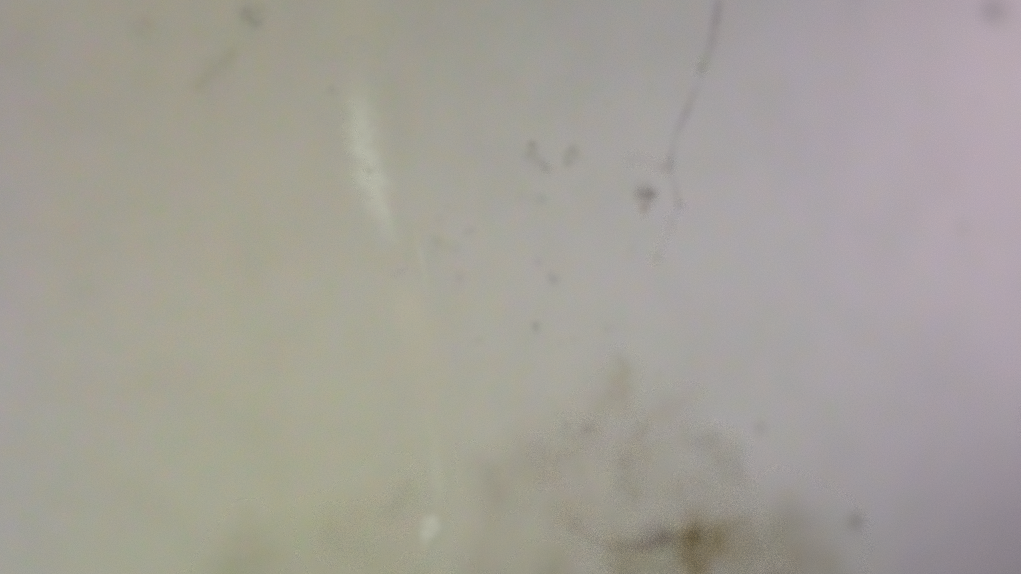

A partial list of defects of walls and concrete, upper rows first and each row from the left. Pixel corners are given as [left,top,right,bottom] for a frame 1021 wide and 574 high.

crack [665,0,725,211]
damp [427,334,872,574]